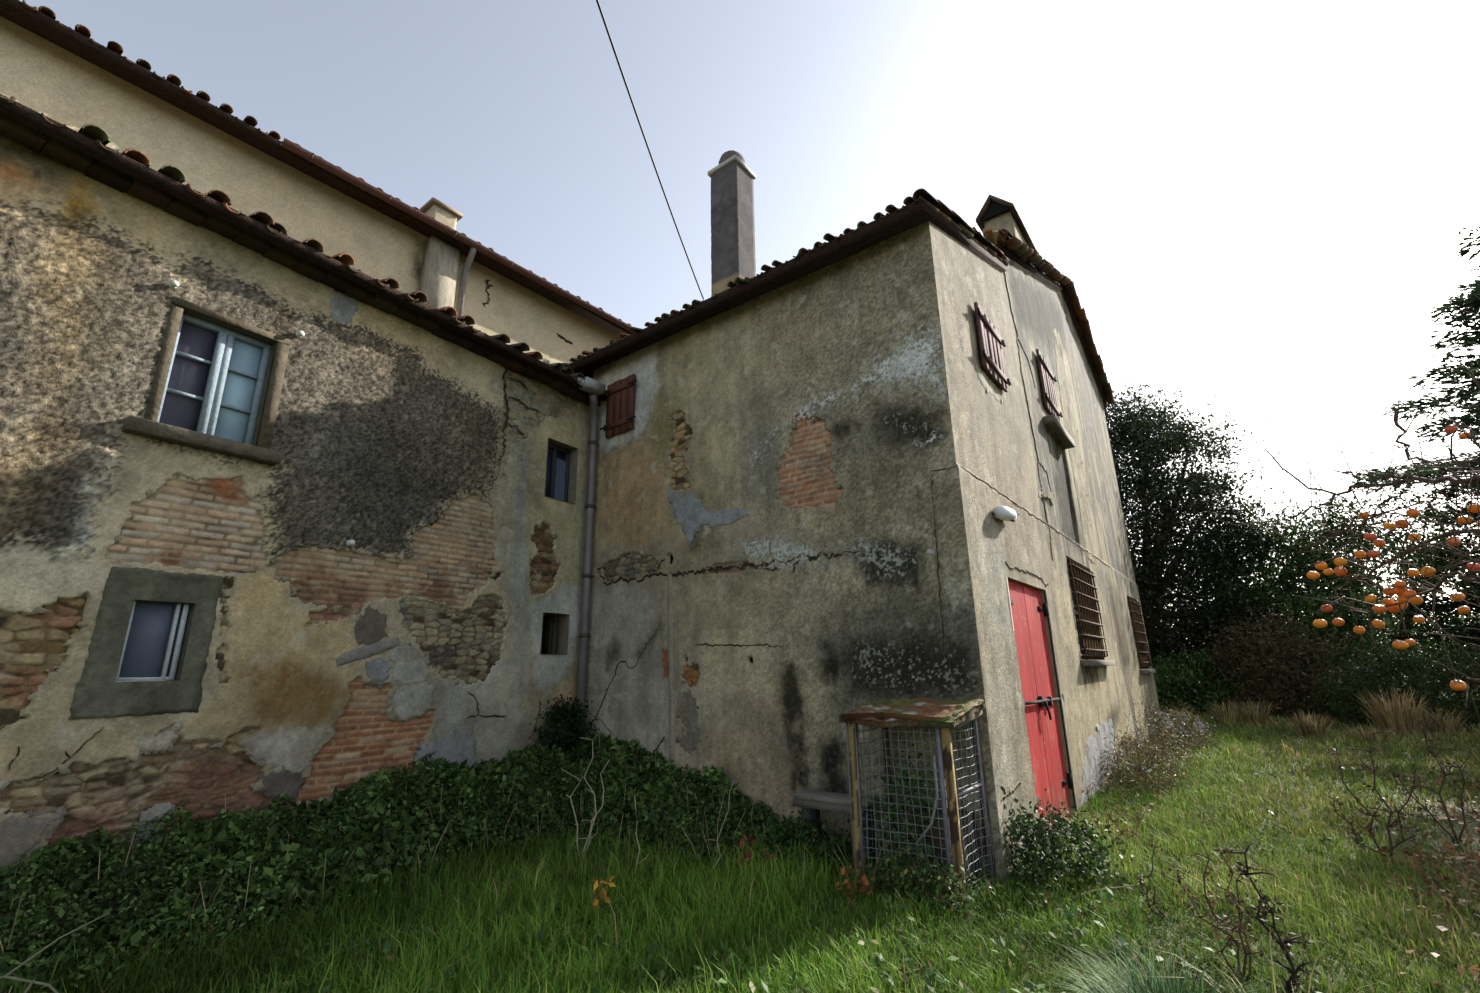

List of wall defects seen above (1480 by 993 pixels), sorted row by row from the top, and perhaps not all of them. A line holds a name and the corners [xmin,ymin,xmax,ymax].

crack [497,368,541,466]
spalling [667,411,693,491]
damp [754,324,948,458]
spalling [104,474,508,685]
spalling [529,522,560,597]
spalling [0,593,88,730]
spalling [0,677,433,892]
crack [589,629,658,734]
peeling [676,662,702,754]
damp [783,663,806,786]
damp [822,739,844,793]
damp [823,635,975,698]